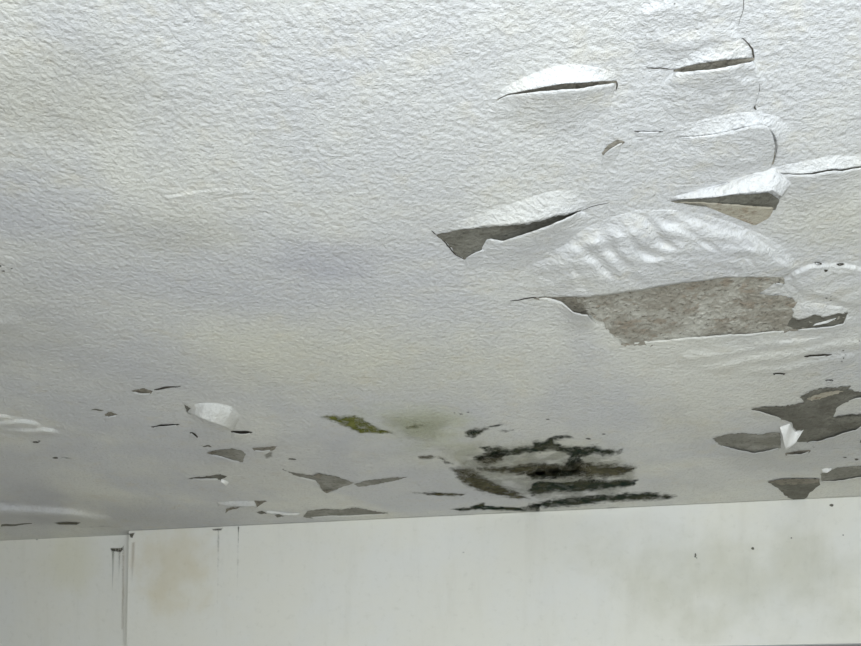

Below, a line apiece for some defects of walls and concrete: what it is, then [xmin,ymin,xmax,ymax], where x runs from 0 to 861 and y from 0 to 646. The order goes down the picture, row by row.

crack [487,64,618,134]
crack [600,0,861,212]
peeling [432,168,859,365]
peeling [712,386,861,462]
peeling [217,469,406,522]
leakage [420,436,671,512]
peeling [768,466,861,500]